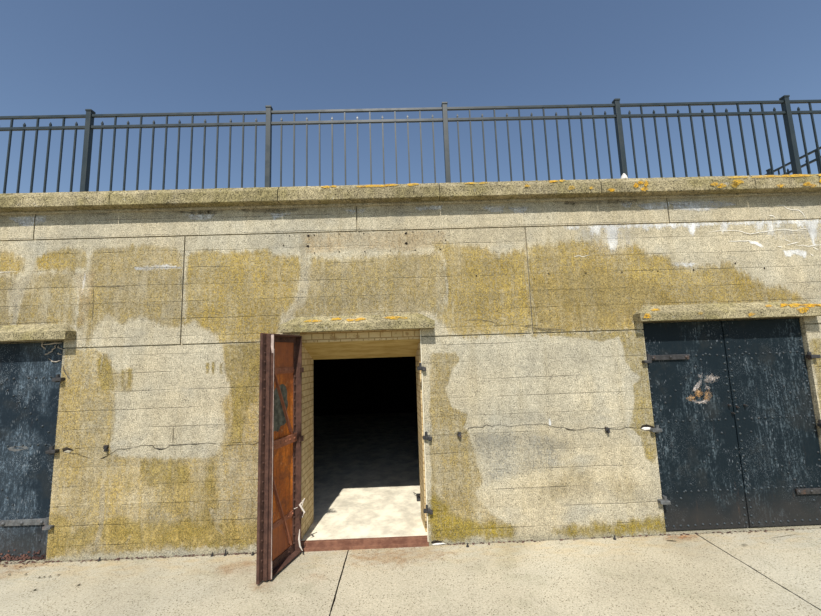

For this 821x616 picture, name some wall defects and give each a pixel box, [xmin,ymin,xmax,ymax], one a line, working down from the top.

water stain [0,220,819,557]